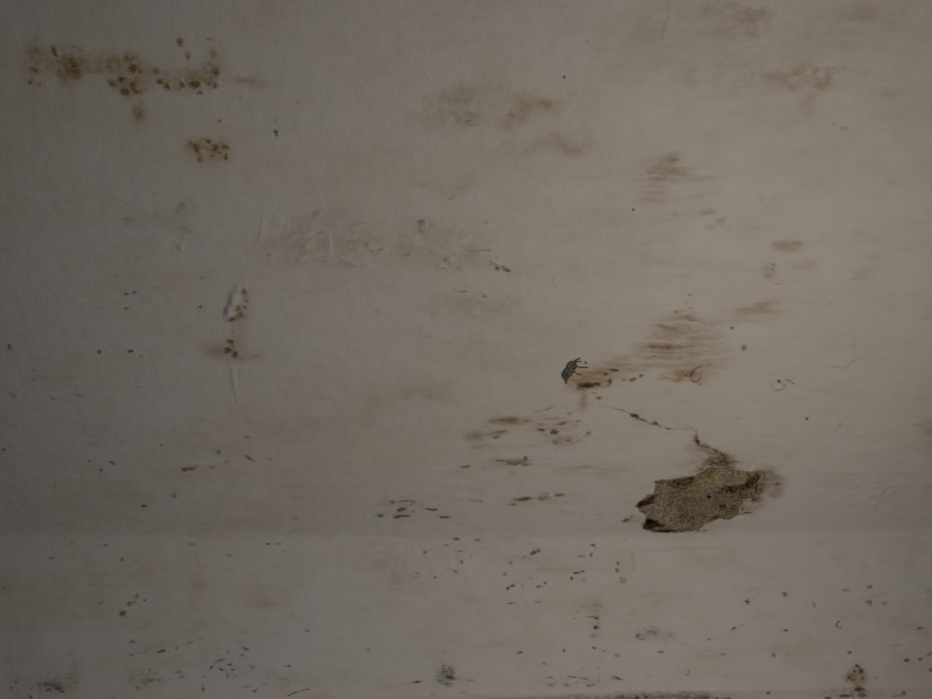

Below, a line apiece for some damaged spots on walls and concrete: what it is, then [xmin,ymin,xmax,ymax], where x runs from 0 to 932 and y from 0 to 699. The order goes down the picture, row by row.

peeling [625,458,770,542]